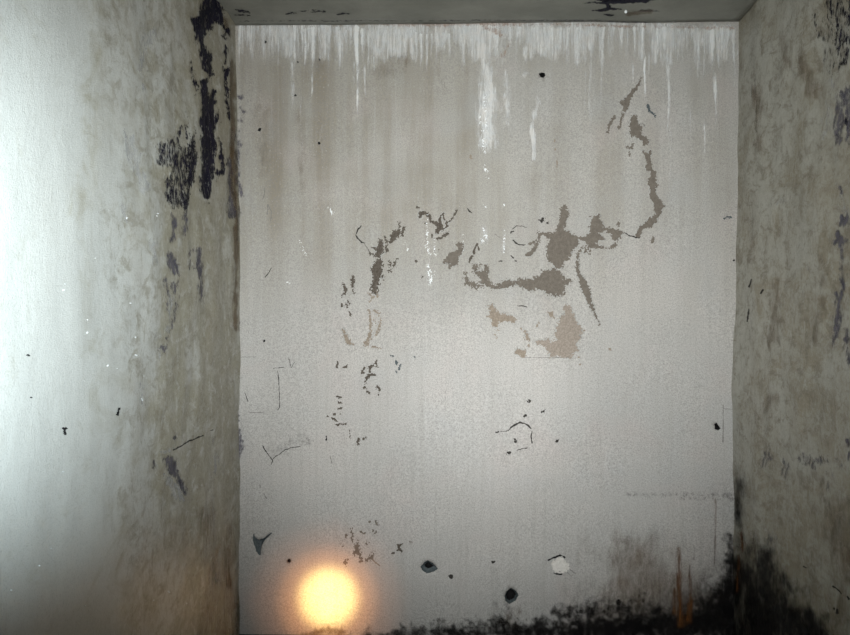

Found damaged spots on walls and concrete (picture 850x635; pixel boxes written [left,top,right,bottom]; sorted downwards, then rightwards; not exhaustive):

damp [155,0,738,359]
peeling [416,206,458,250]
peeling [442,76,666,365]
peeling [340,221,406,349]
damp [734,480,743,525]
spalling [421,560,438,573]
spalling [505,588,519,604]
spalling [548,554,570,575]
damp [382,534,828,635]